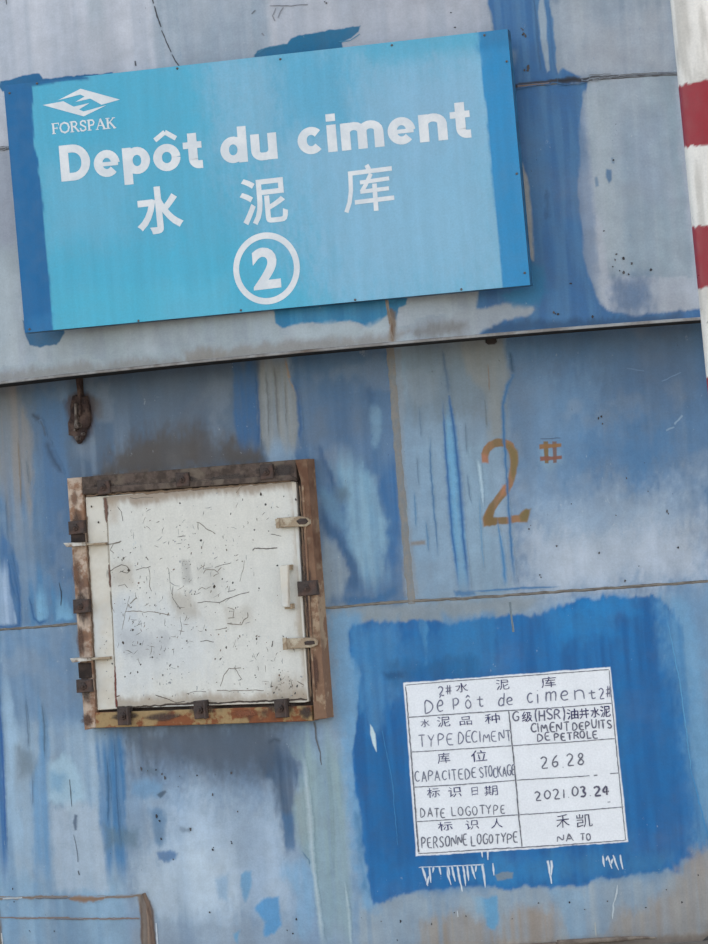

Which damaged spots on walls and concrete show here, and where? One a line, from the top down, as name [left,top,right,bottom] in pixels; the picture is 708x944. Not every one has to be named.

corrosion [61,389,107,447]
corrosion [71,465,310,725]
corrosion [288,595,319,718]
corrosion [0,891,158,944]